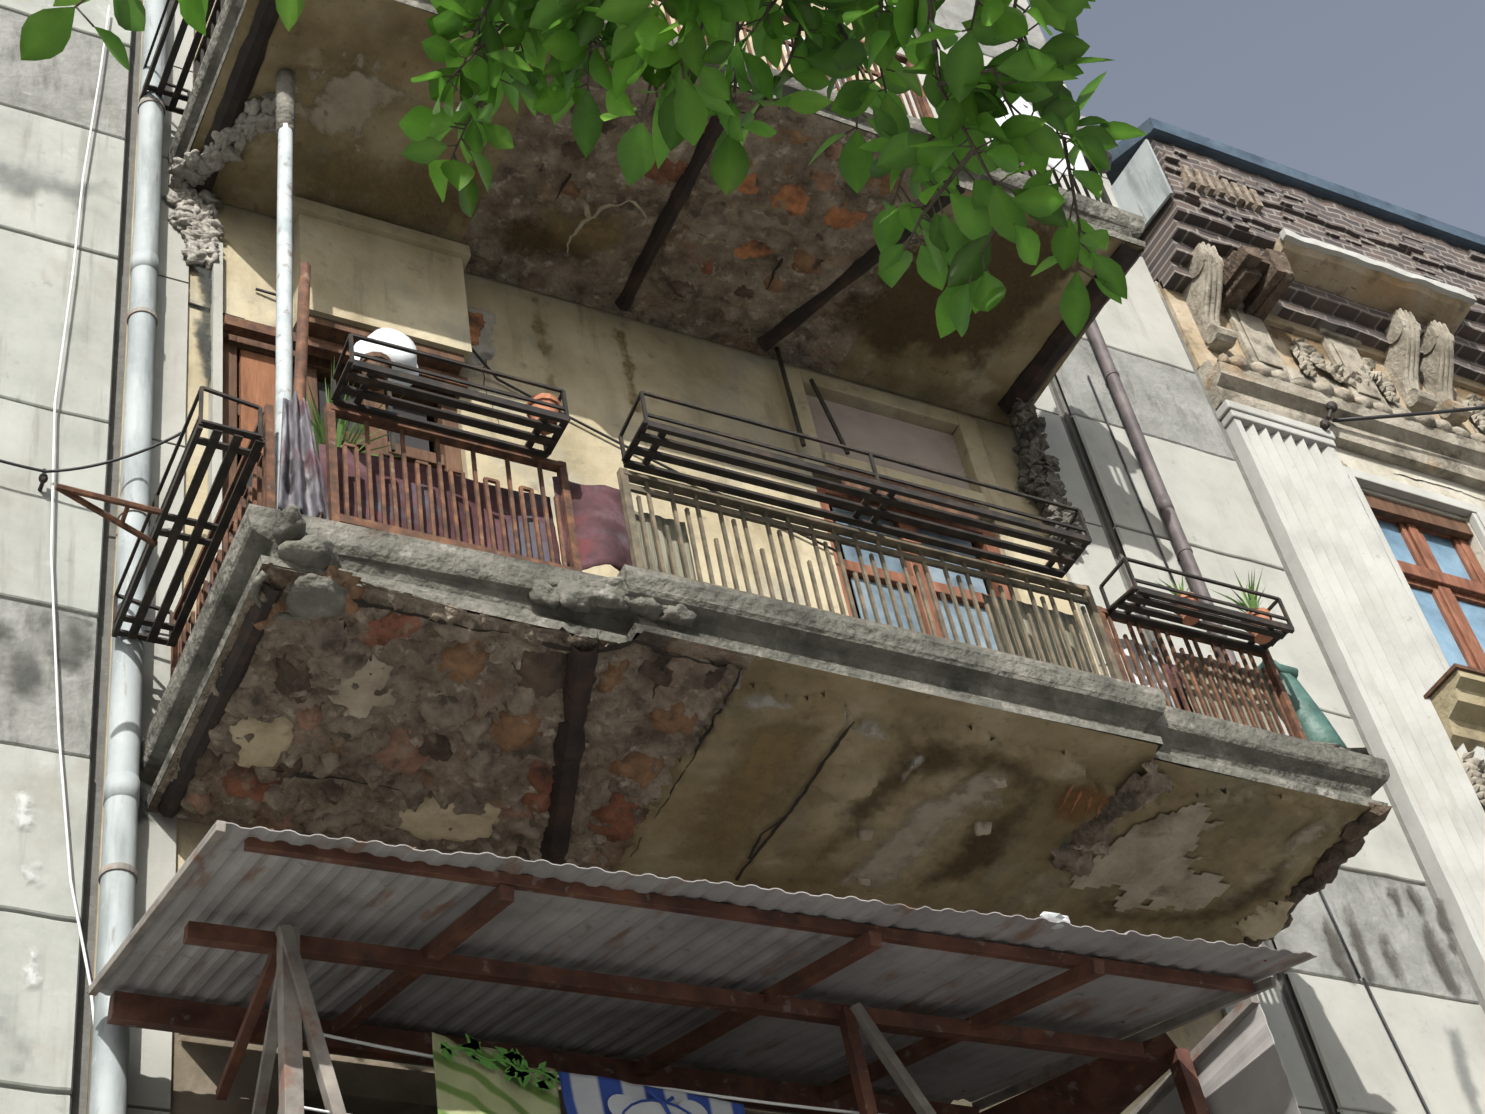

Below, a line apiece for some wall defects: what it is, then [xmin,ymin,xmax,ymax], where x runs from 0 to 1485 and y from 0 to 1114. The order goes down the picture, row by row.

peeling [294,53,416,151]
spalling [514,85,926,334]
peeling [466,306,497,370]
water stain [0,622,40,686]
water stain [50,608,90,663]
spalling [168,563,746,872]
crack [735,721,855,881]
water stain [852,745,1037,824]
water stain [931,806,1025,882]
peeling [1070,802,1231,912]
spalling [1231,803,1393,947]